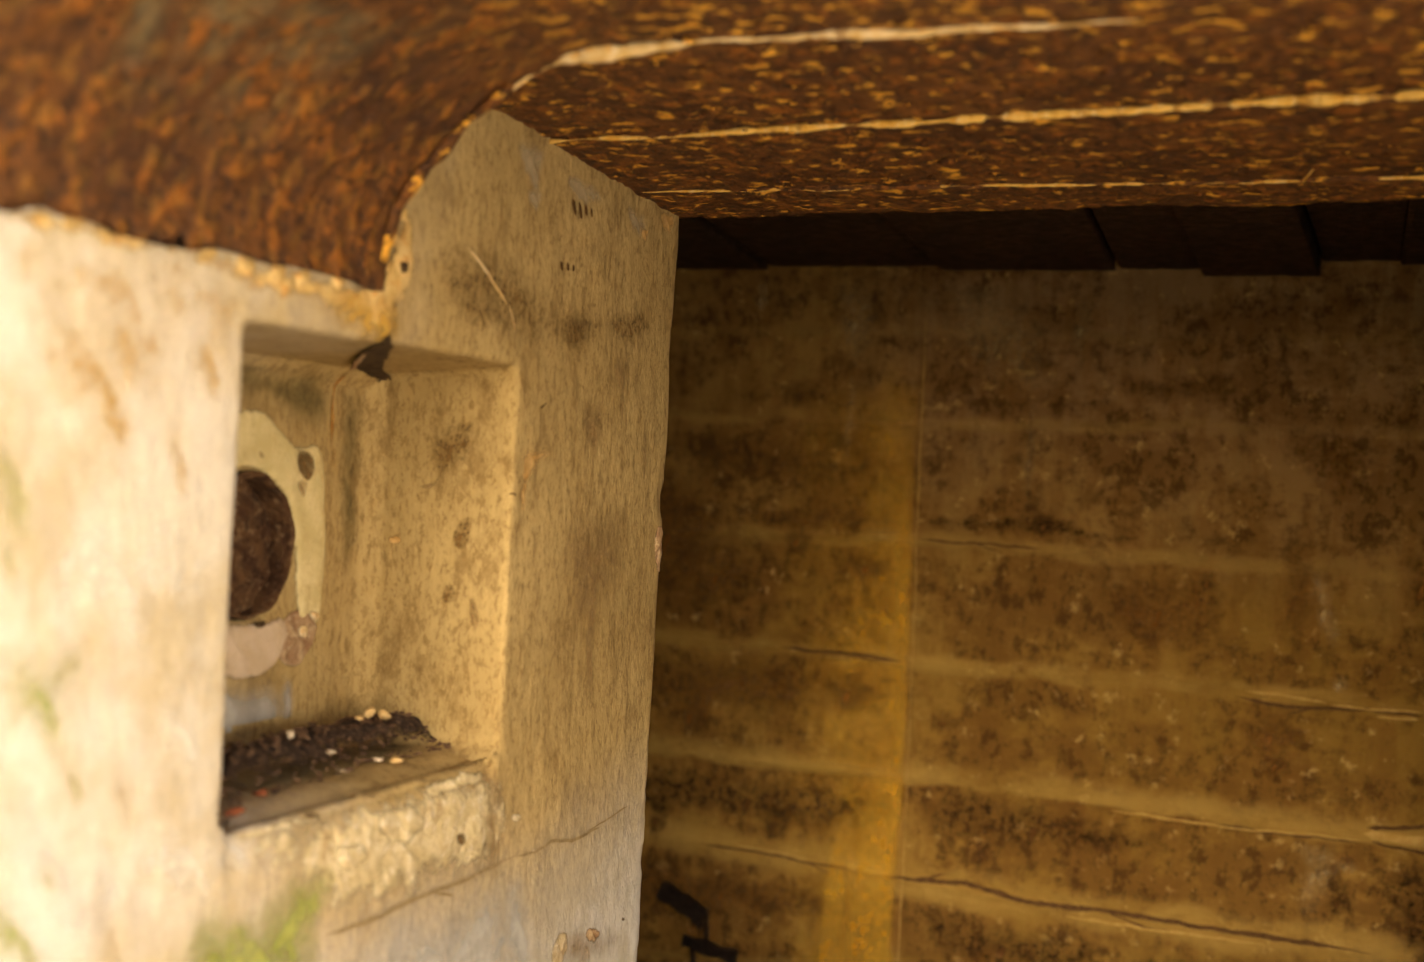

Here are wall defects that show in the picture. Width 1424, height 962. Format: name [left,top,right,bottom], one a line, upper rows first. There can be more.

crack [1236,691,1423,721]
water stain [932,797,1142,864]
crack [1112,810,1424,855]
crack [325,806,628,935]
water stain [640,771,899,962]
crack [702,843,1371,954]
water stain [931,923,1086,962]